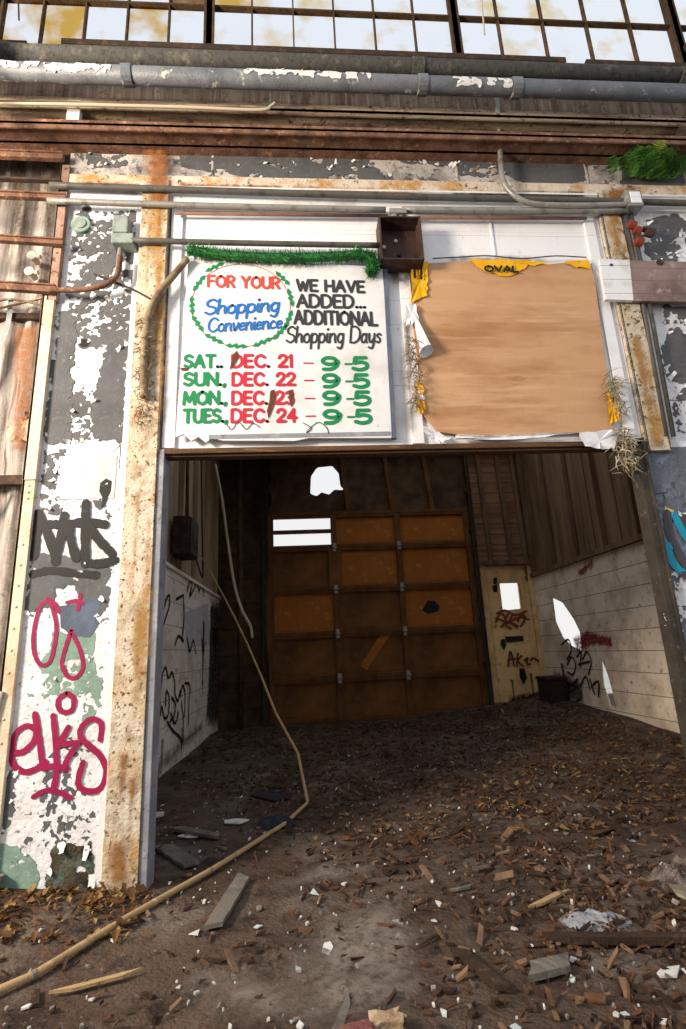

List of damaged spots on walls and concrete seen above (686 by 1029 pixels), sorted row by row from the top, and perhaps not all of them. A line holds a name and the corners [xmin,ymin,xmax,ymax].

corrosion [137,150,167,355]
peeling [178,155,393,180]
corrosion [603,187,634,198]
peeling [644,214,686,261]
peeling [39,206,137,520]
corrosion [634,336,661,444]
peeling [661,304,686,433]
peeling [23,552,114,722]
corrosion [133,587,149,677]
peeling [0,737,96,889]
corrosion [111,847,124,881]
corrosion [120,755,134,803]